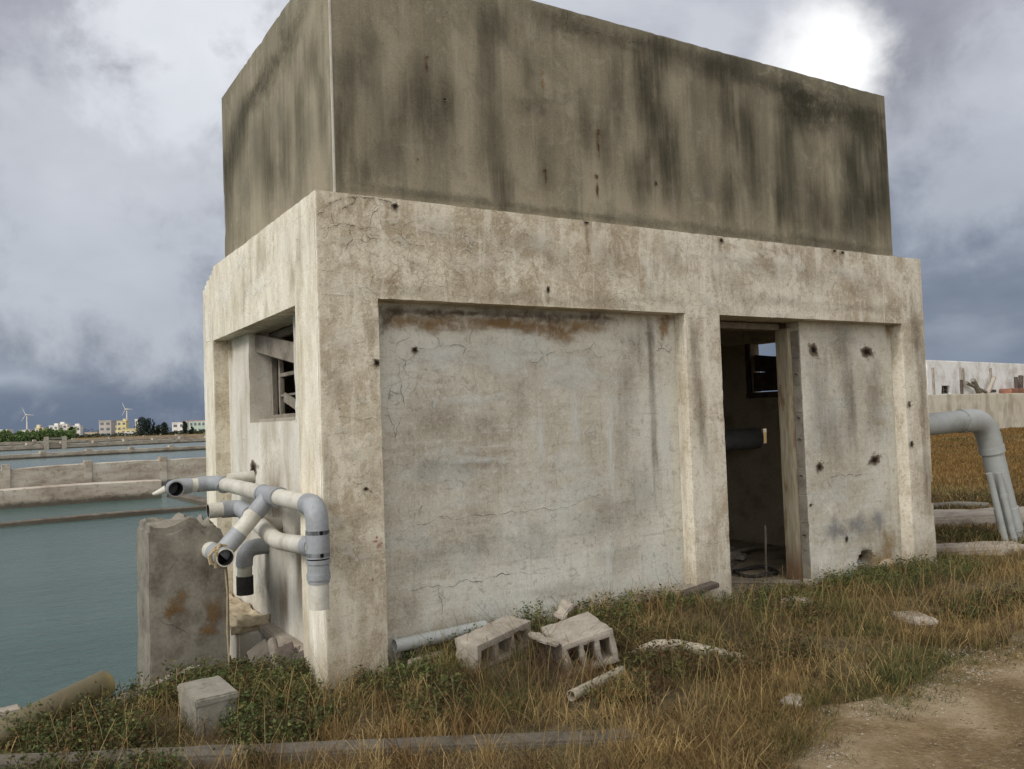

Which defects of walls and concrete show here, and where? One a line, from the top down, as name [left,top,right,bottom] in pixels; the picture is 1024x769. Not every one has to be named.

crack [318,196,507,271]
corrosion [474,312,600,339]
spalling [861,343,876,361]
spalling [868,451,882,466]
water stain [312,610,324,649]